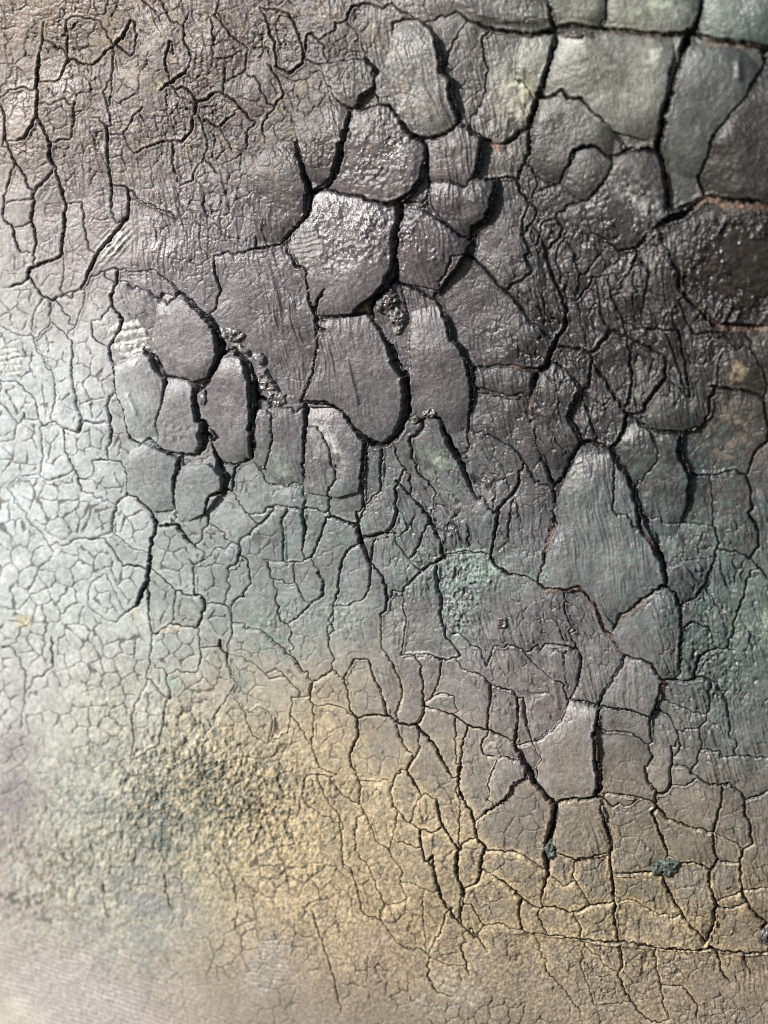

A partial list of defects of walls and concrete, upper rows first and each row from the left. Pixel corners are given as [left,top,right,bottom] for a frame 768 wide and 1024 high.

crack [0,1,301,763]
crack [214,1,768,1023]